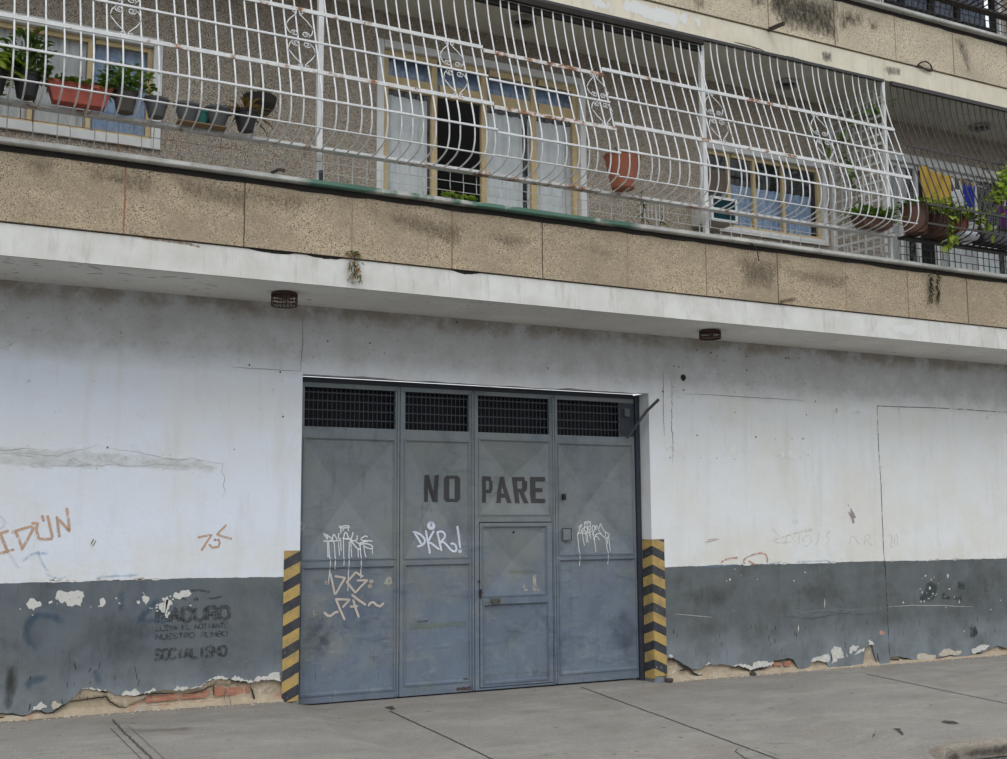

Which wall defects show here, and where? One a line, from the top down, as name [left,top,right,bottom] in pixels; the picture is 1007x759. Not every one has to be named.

peeling [623,0,701,29]
damp [773,0,859,37]
peeling [20,576,161,616]
peeling [137,590,192,618]
flaking render [665,630,1007,682]
flaking render [0,672,284,721]